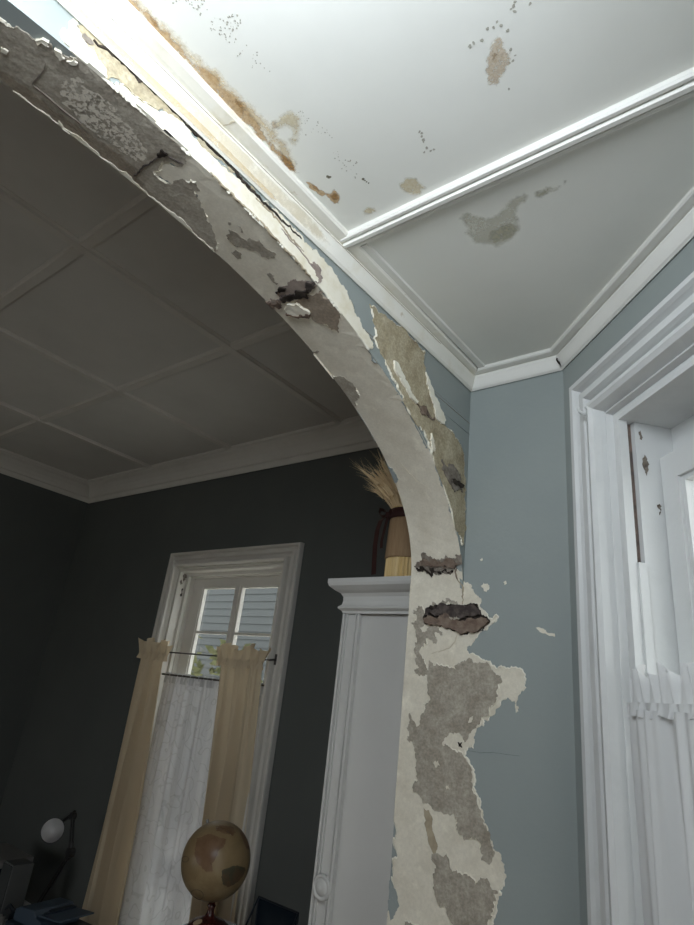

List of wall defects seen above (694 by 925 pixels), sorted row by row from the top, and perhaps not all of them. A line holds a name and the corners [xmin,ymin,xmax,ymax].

damp [63,0,274,199]
crack [93,0,314,277]
peeling [0,17,526,925]